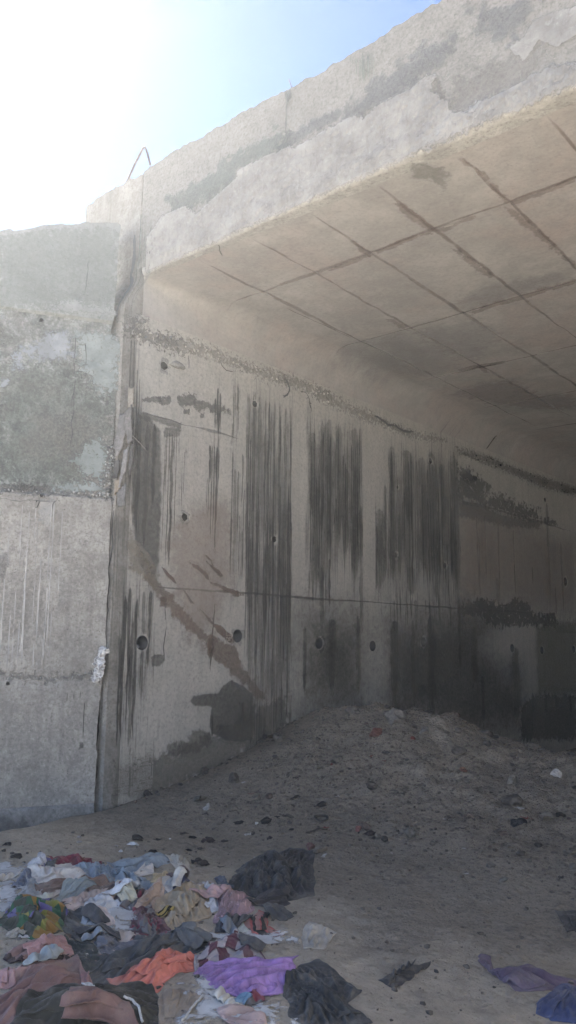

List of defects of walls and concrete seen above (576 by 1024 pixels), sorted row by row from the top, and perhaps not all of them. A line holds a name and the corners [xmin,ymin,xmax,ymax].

crack [116,235,136,323]
leakage [113,403,292,799]
leakage [307,430,558,605]